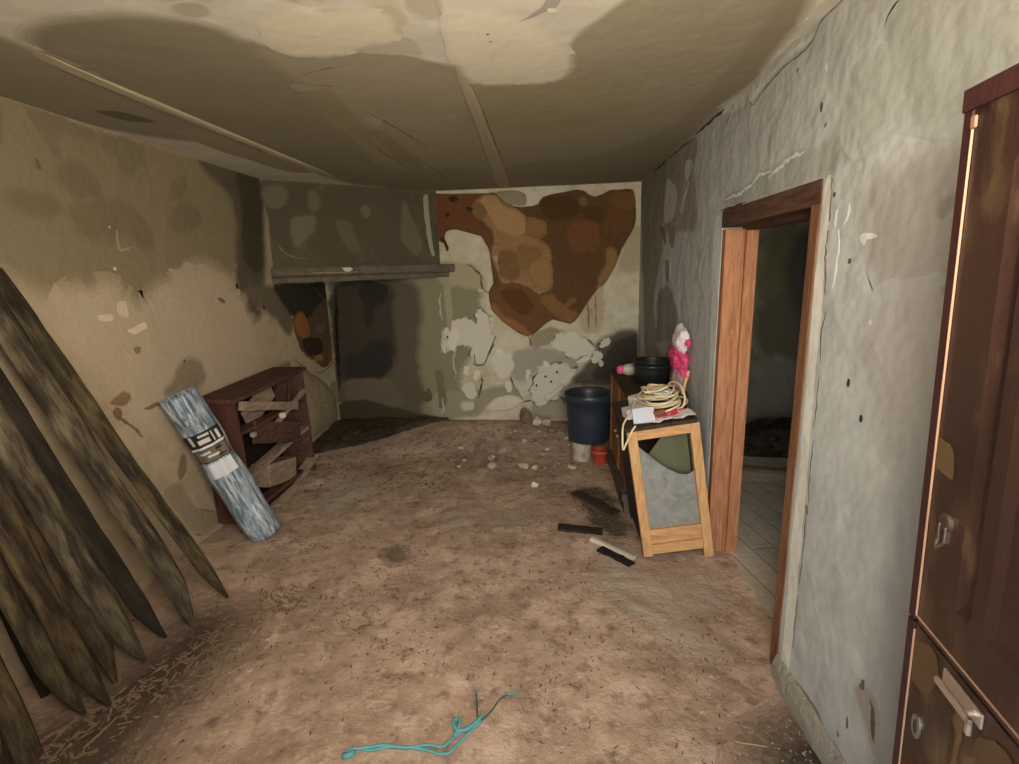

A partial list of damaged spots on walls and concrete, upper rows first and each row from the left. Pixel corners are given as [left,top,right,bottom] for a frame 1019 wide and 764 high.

peeling [721,32,815,113]
leakage [0,0,817,437]
flaking render [423,189,636,407]